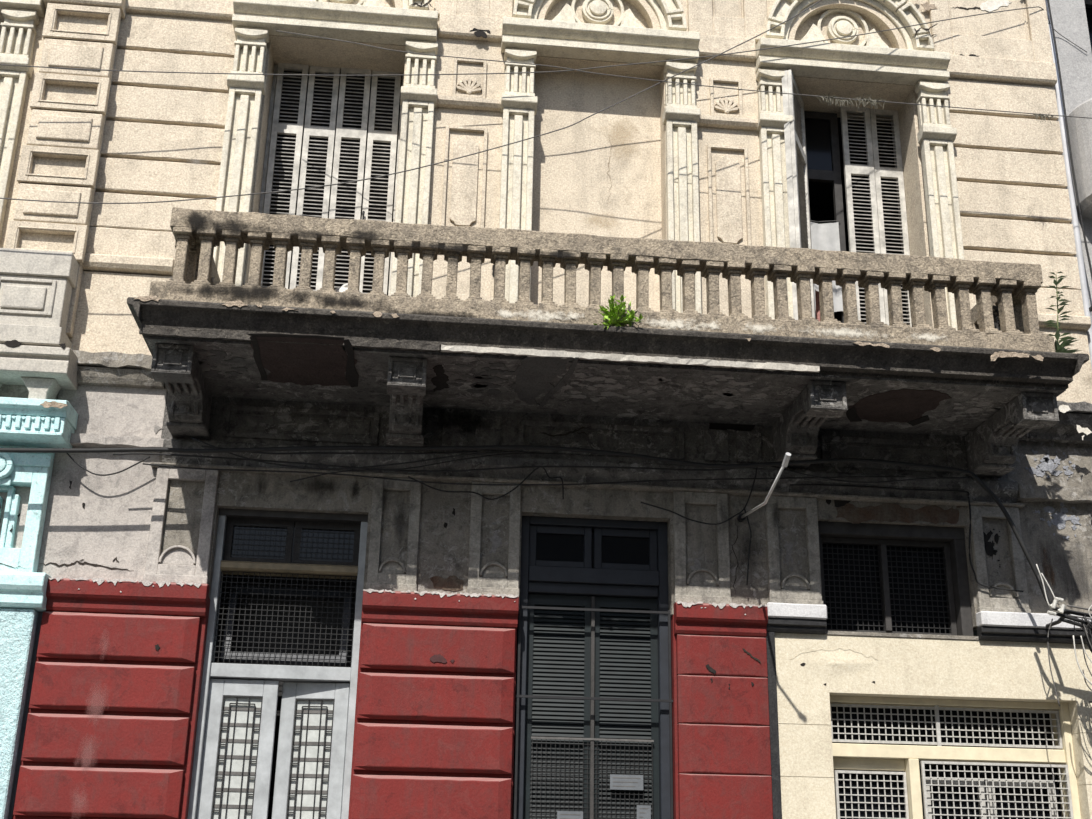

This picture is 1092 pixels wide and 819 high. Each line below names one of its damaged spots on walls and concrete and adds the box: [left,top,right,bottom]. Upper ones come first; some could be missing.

peeling [980,0,1012,12]
water stain [187,212,266,232]
water stain [349,229,381,240]
water stain [405,243,485,252]
spalling [990,351,1044,361]
spalling [846,389,1007,426]
crack [0,557,134,571]
peeling [48,576,202,592]
peeling [363,575,519,602]